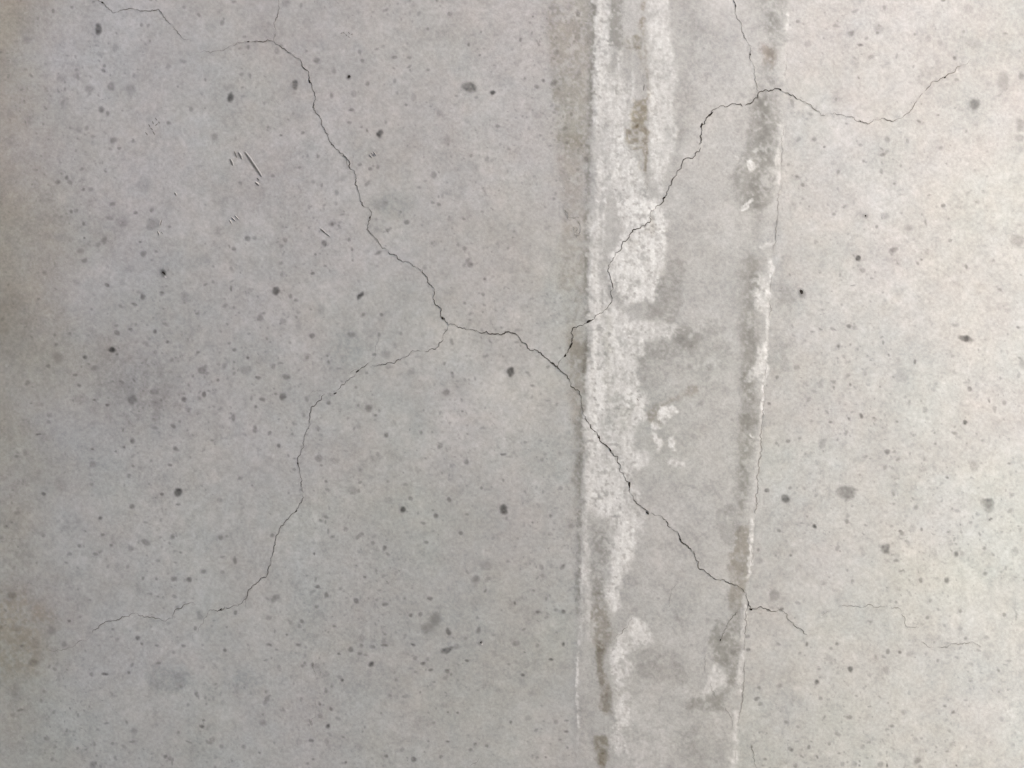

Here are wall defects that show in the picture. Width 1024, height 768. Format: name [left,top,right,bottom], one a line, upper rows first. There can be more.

crack [50,0,968,652]
water stain [538,0,805,768]